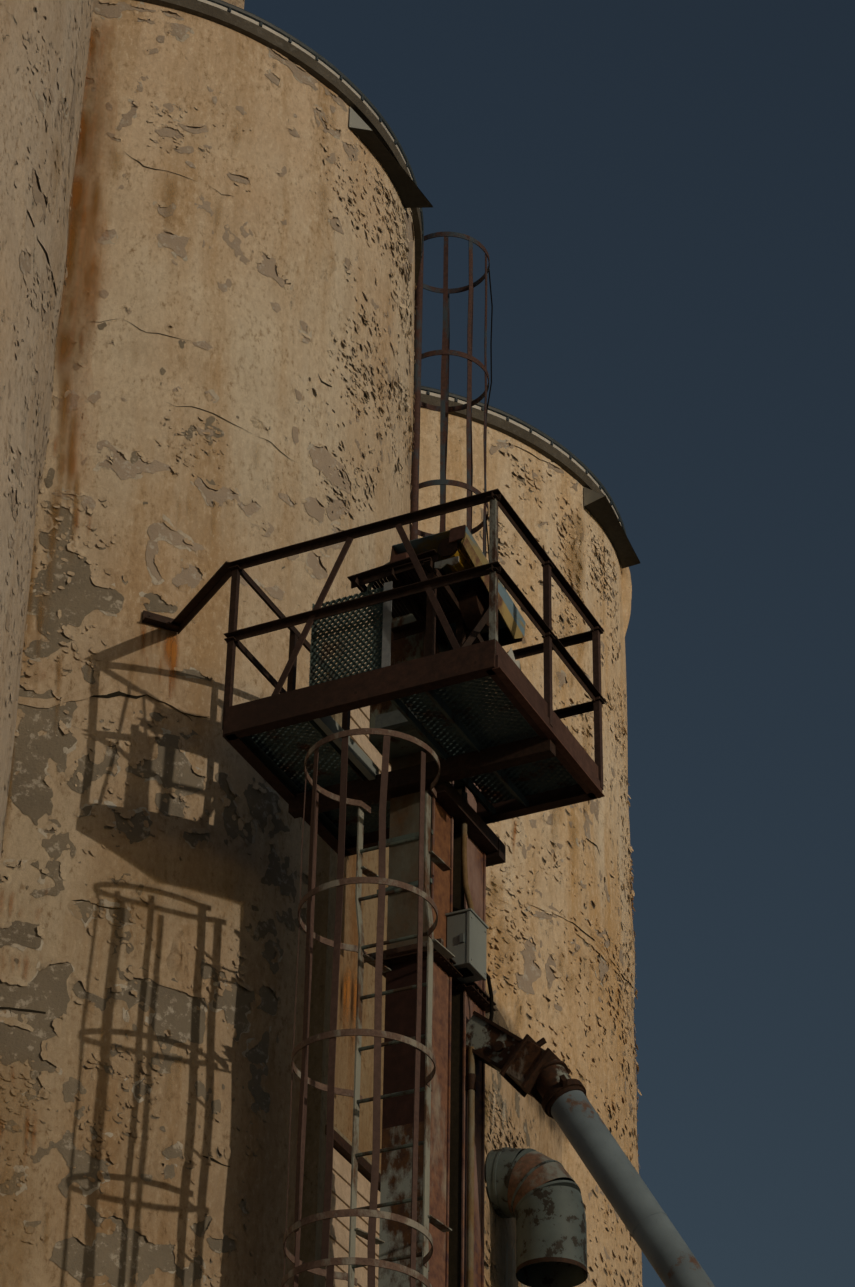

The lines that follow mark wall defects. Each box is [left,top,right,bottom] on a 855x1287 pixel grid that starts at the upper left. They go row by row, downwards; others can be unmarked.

corrosion [76,115,87,158]
corrosion [68,179,99,270]
peeling [265,47,417,579]
peeling [0,0,308,1287]
crack [18,688,210,721]
peeling [473,439,642,1170]
peeling [583,1185,643,1287]